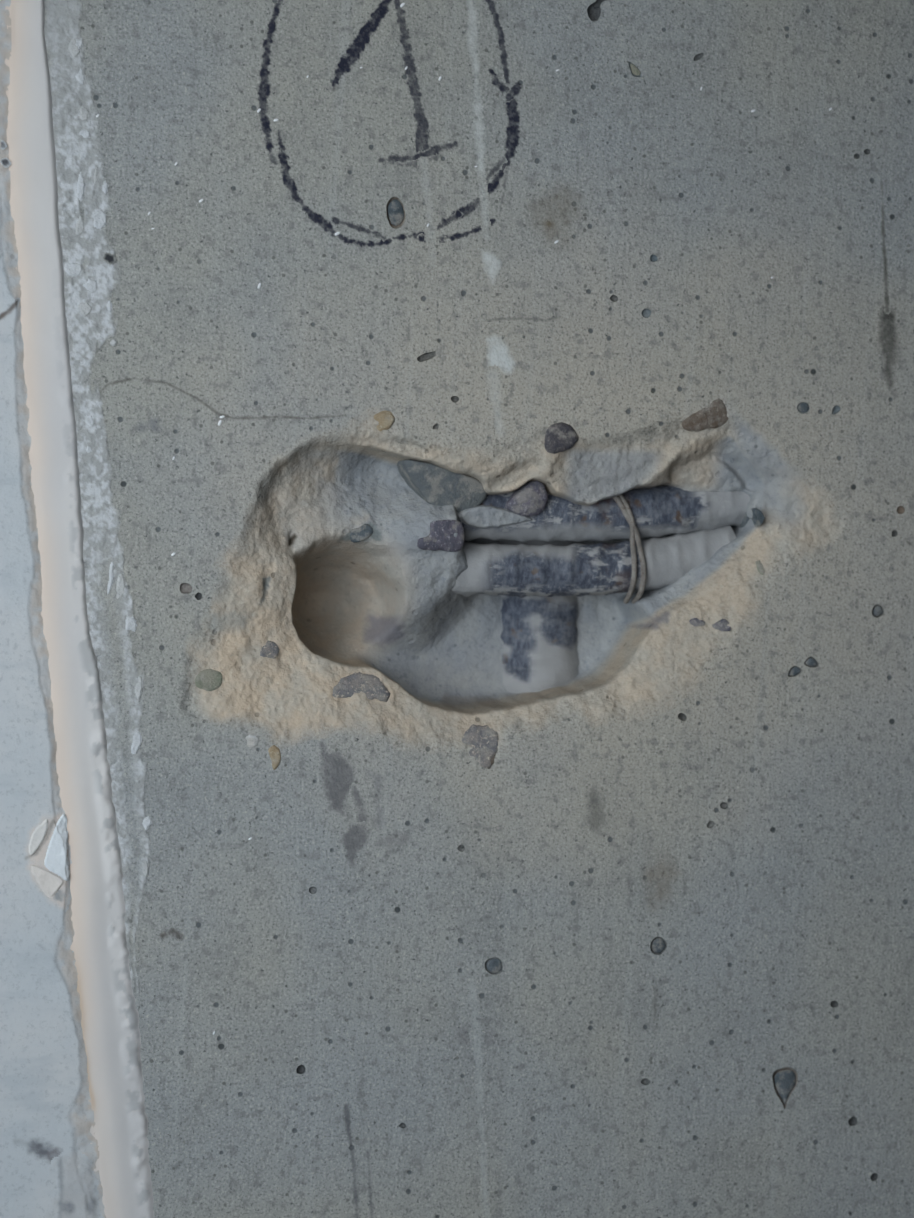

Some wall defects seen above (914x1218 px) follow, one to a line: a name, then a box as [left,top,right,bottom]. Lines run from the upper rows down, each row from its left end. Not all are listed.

spalling [173,389,851,770]